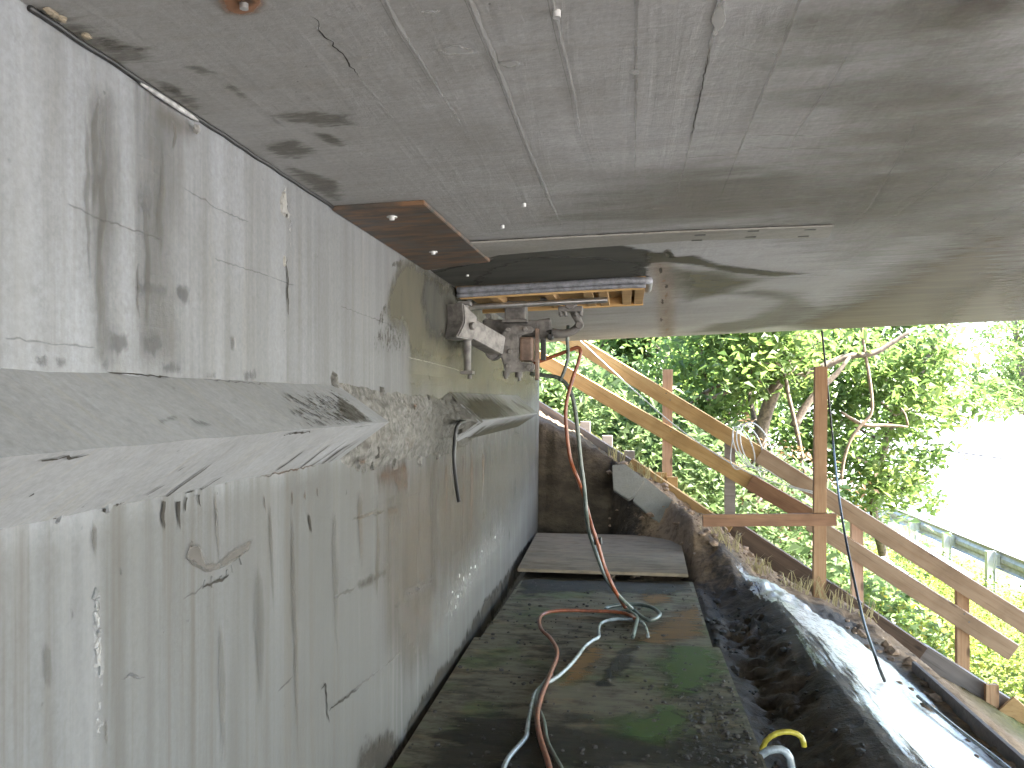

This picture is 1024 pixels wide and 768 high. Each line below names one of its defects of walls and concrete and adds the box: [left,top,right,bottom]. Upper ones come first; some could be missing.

crack [313,17,391,116]
crack [692,48,710,133]
crack [280,191,290,219]
crack [282,255,290,315]
leakage [378,246,800,439]
leakage [288,390,368,426]
spalling [330,371,483,502]
spalling [187,541,251,589]
peeling [91,587,103,675]
crack [322,683,357,719]